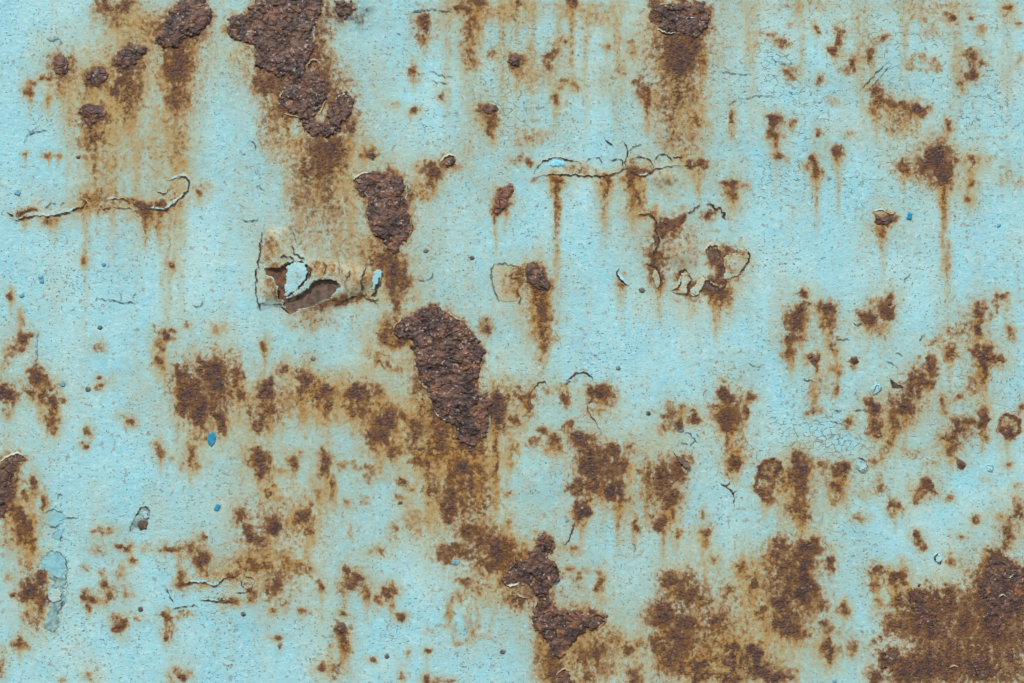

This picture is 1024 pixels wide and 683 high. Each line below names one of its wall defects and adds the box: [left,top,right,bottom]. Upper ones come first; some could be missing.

crack [7,171,193,221]
rust [15,0,217,243]
peeling [255,224,383,330]
rust [151,0,859,683]
peeling [490,262,527,302]
crack [533,137,701,179]
peeling [639,203,750,296]
rust [813,0,991,283]
rust [0,447,55,679]
rust [862,483,1024,683]